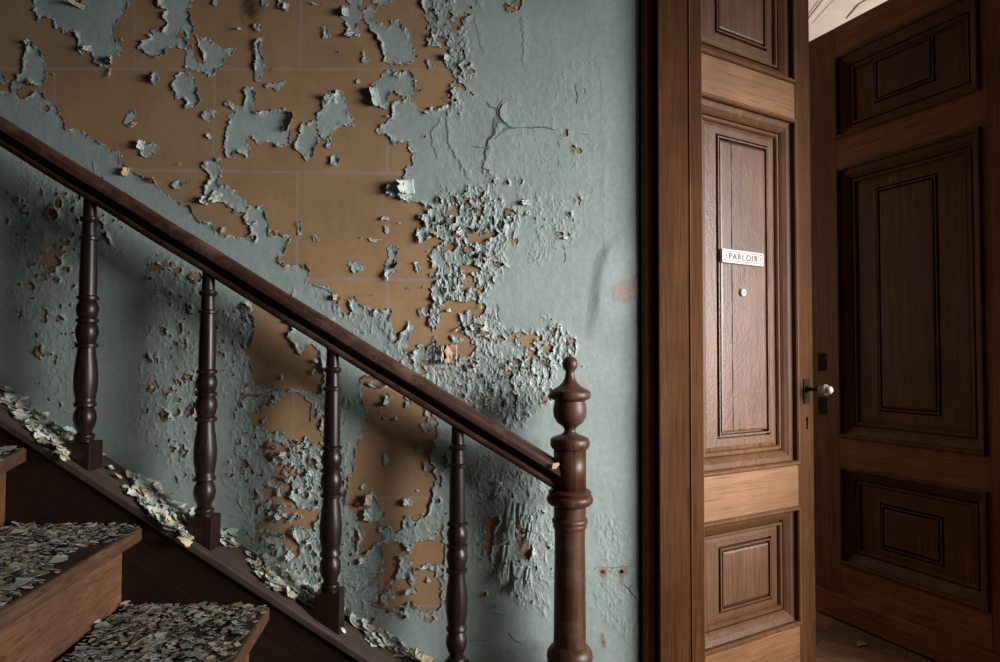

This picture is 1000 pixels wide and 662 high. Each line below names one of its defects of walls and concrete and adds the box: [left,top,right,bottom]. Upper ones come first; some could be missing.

peeling [0,0,576,421]
crack [473,99,560,176]
peeling [216,303,325,582]
peeling [341,376,450,624]
peeling [477,481,545,604]